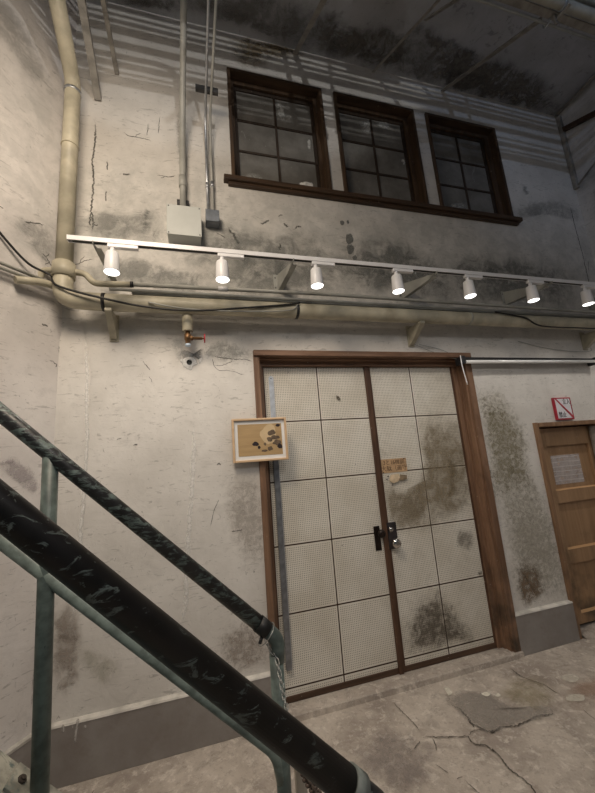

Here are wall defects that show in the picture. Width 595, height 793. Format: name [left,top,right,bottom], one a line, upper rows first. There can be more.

damp [213,0,299,57]
damp [312,16,551,109]
crack [89,128,108,229]
damp [483,398,529,490]
damp [519,568,543,603]
crack [396,706,553,793]